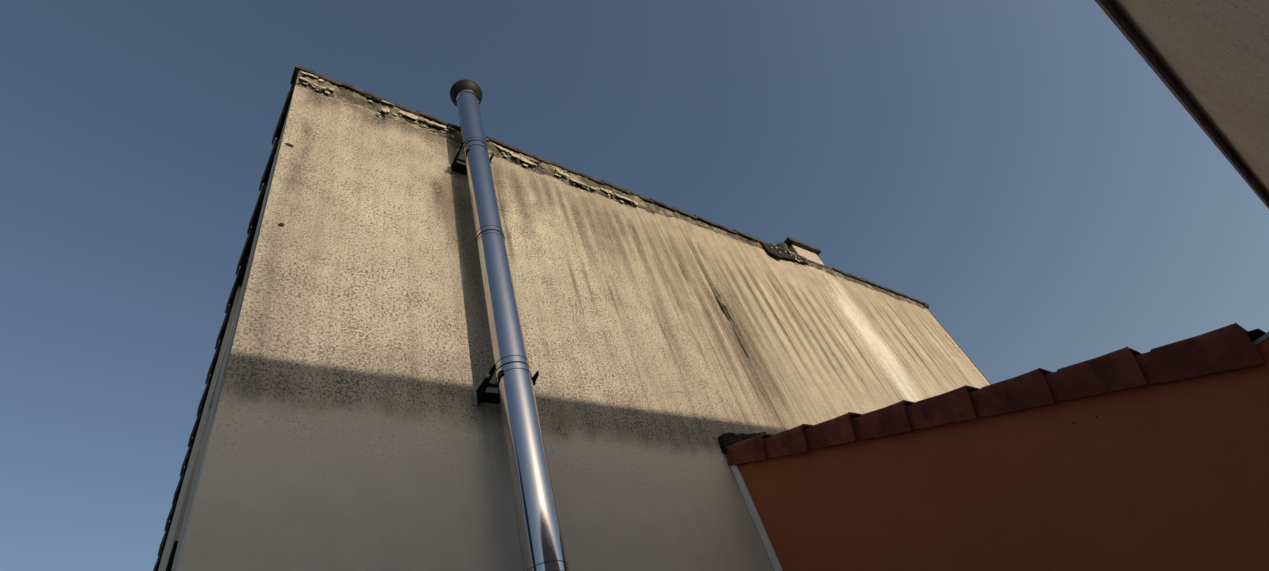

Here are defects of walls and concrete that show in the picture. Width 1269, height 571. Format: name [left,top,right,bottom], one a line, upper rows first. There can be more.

leakage [832,279,921,402]